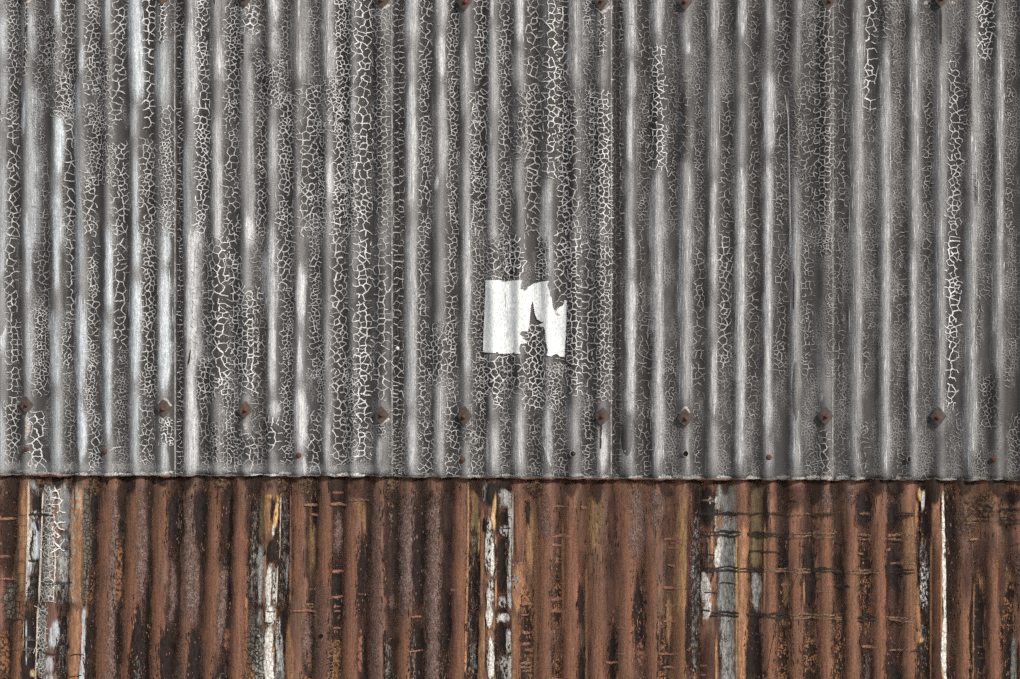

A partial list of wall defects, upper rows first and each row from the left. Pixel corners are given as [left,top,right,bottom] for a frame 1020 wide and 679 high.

crack [0,0,1020,478]
peeling [0,471,186,679]
peeling [245,471,301,679]
corrosion [68,479,723,679]
peeling [458,474,839,679]
corrosion [734,483,1020,679]